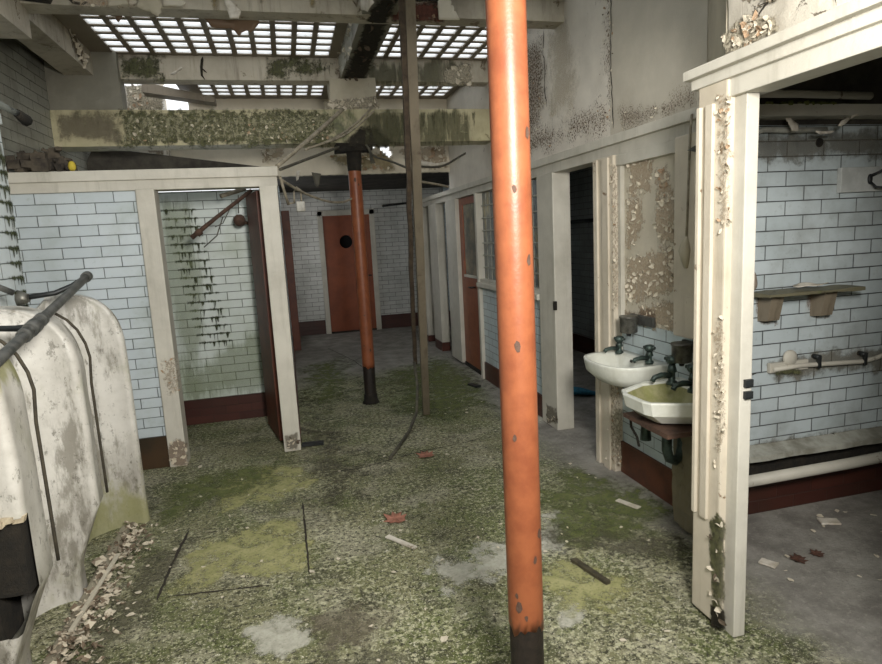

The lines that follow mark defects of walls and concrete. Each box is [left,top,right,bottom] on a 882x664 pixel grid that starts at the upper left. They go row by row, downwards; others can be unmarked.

leakage [58,112,121,142]
peeling [713,96,733,154]
peeling [610,159,674,331]
leakage [161,208,232,346]
peeling [169,439,188,466]